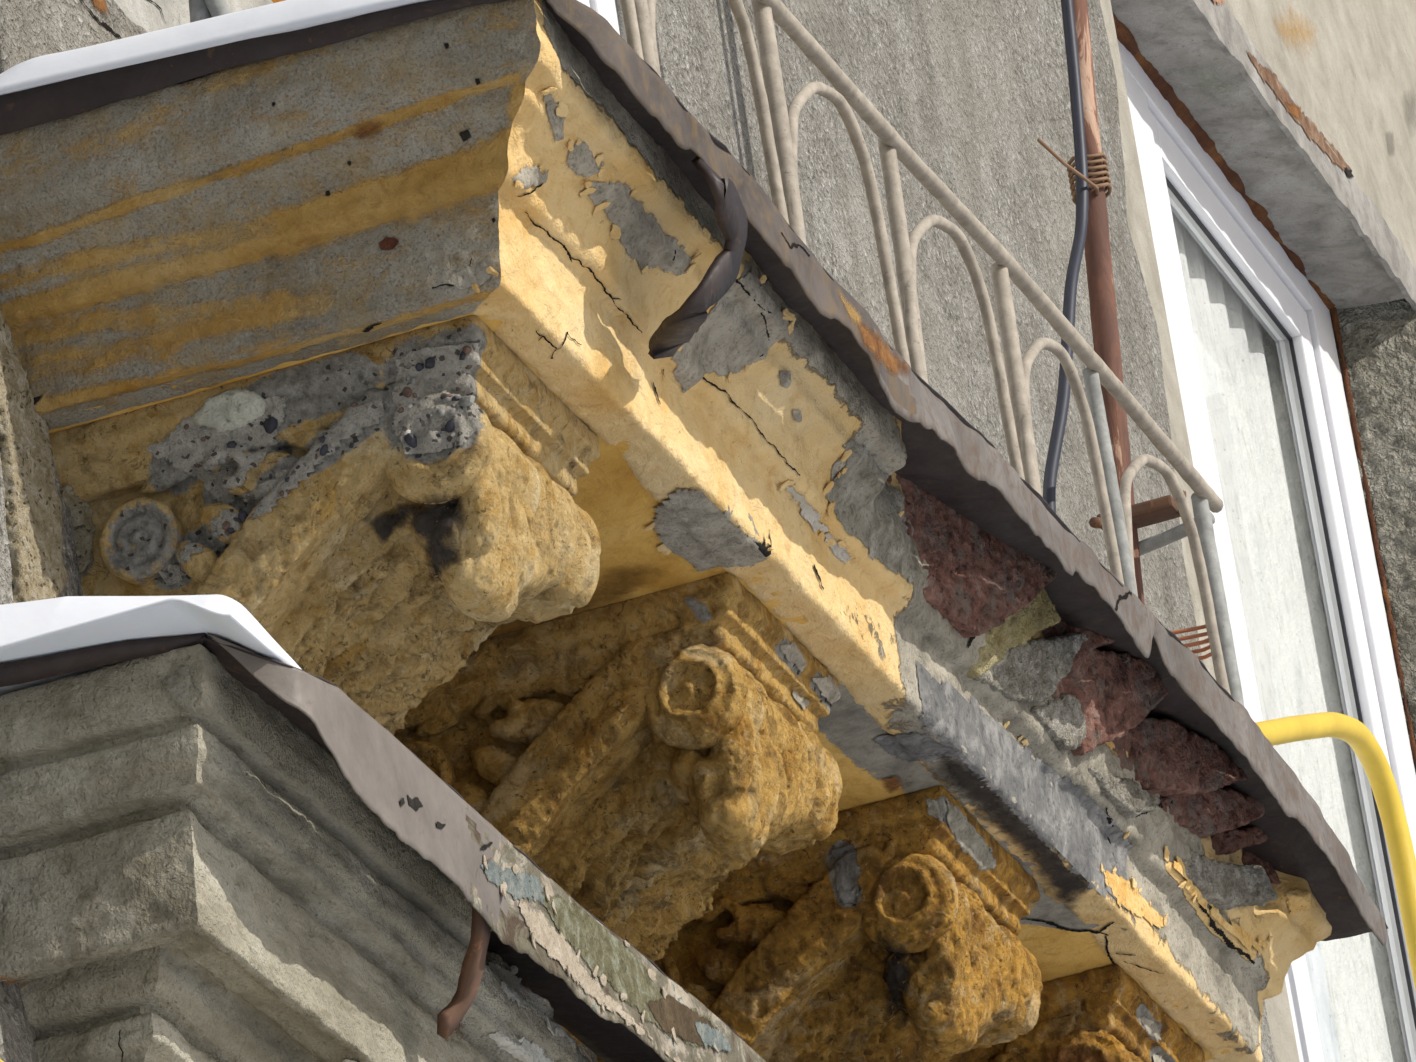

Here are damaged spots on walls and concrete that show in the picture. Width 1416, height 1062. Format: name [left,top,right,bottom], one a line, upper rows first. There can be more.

spalling [512,164,549,189]
peeling [542,87,702,276]
crack [518,183,642,333]
peeling [672,268,796,393]
spalling [147,340,481,586]
water stain [366,499,463,580]
spalling [643,489,774,572]
crack [703,377,800,476]
spalling [779,438,1312,953]
peeling [481,855,732,1062]